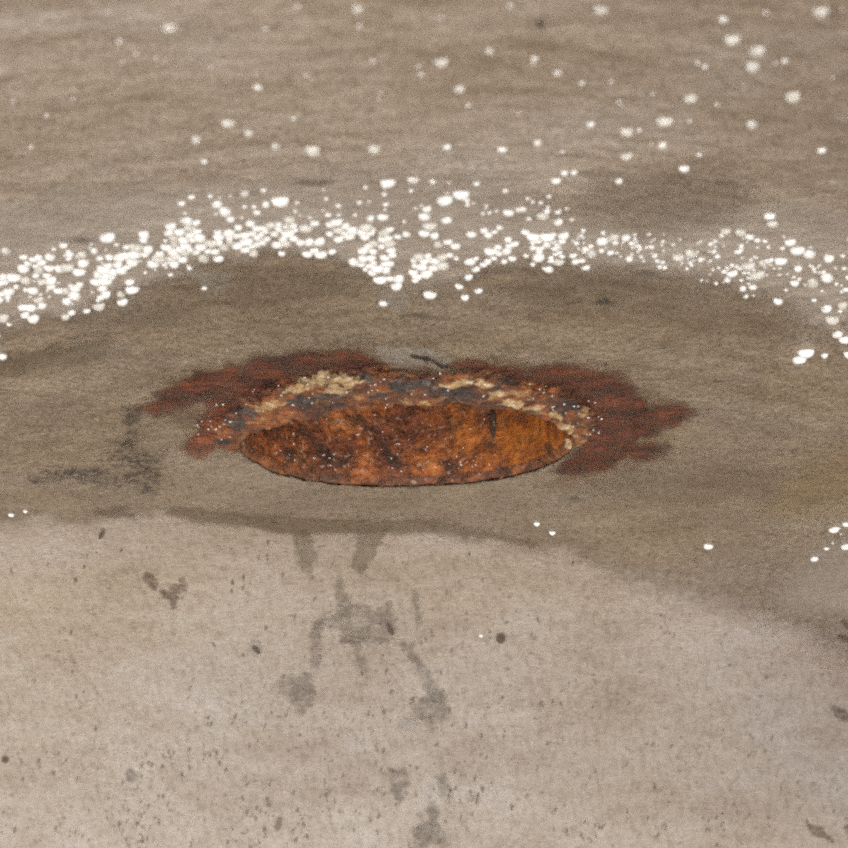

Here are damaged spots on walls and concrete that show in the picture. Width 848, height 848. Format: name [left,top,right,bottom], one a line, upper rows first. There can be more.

water stain [551,171,577,184]
rust [138,352,384,455]
water stain [0,176,848,639]
rust [454,362,693,474]